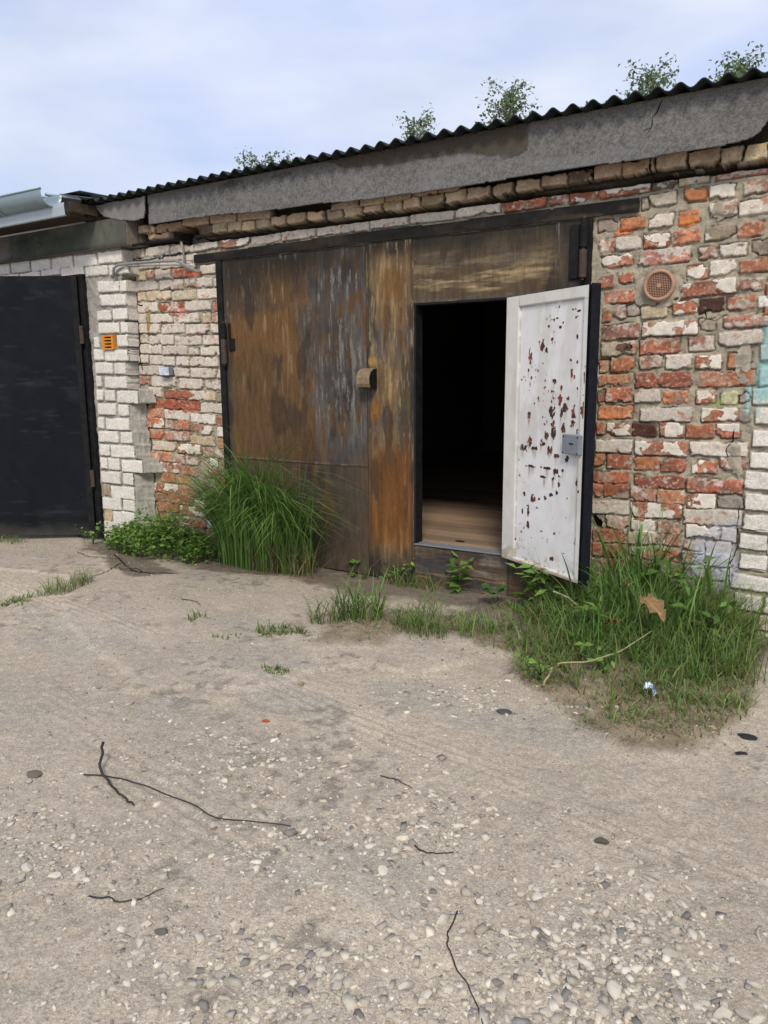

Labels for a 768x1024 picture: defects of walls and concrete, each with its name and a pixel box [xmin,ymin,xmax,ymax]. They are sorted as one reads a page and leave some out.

peeling [572,183,651,202]
peeling [685,183,736,201]
spalling [614,215,699,248]
peeling [602,253,632,265]
peeling [616,265,736,351]
peeling [699,354,722,369]
peeling [178,426,218,468]
rust [515,305,585,549]
peeling [607,422,707,474]
peeling [696,390,740,432]
peeling [630,493,716,533]
peeling [685,523,719,538]